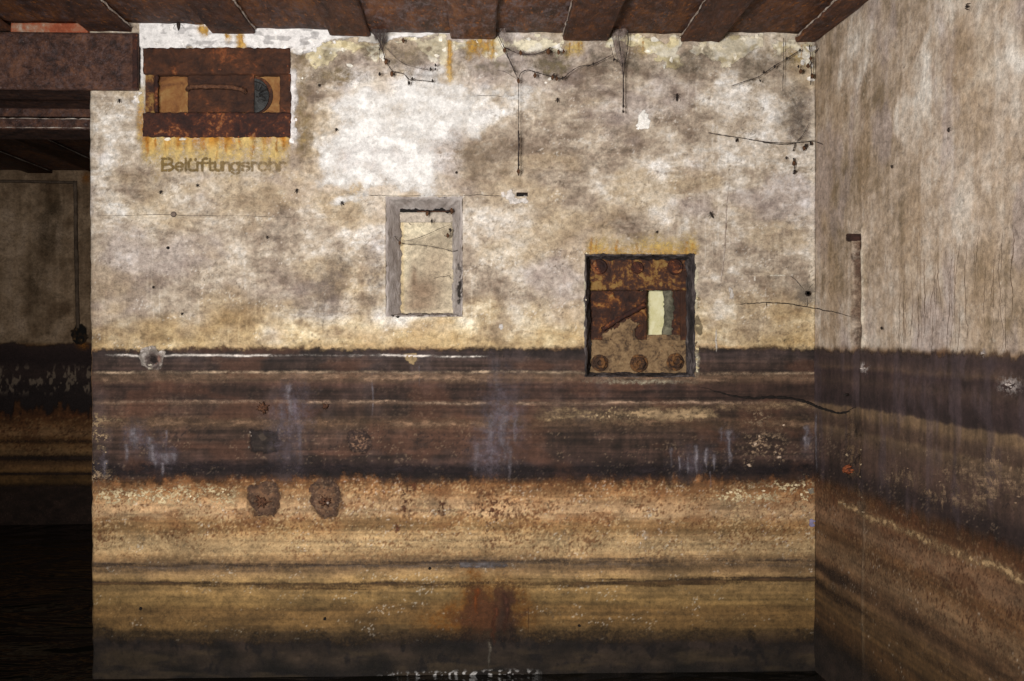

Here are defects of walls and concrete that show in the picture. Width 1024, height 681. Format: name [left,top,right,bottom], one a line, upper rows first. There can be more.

rust [137,95,289,166]
rust [587,240,698,254]
crack [744,276,847,316]
crack [701,387,853,414]
leakage [0,342,1024,584]
rust [432,570,530,662]